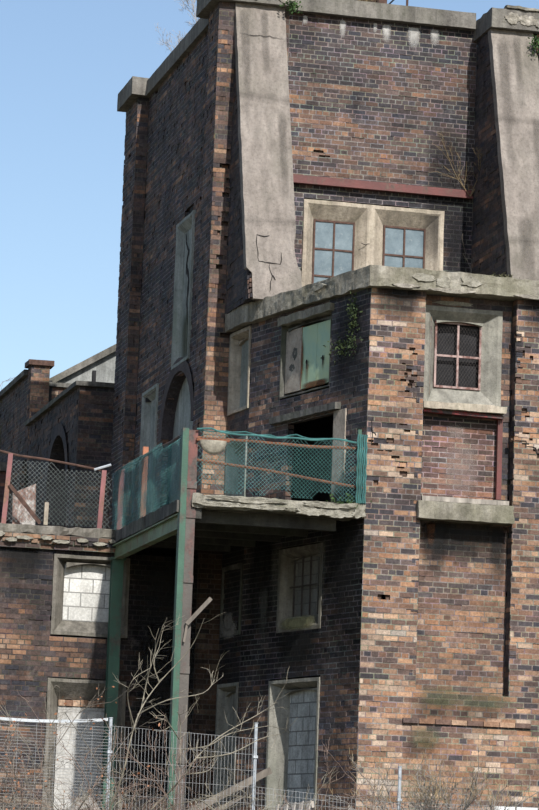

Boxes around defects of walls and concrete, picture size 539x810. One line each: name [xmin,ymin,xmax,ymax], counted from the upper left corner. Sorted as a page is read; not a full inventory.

water stain [409,28,419,42]
spalling [504,12,539,28]
crack [183,242,191,309]
crack [256,234,282,290]
spalling [392,273,482,307]
corrosion [301,342,325,388]